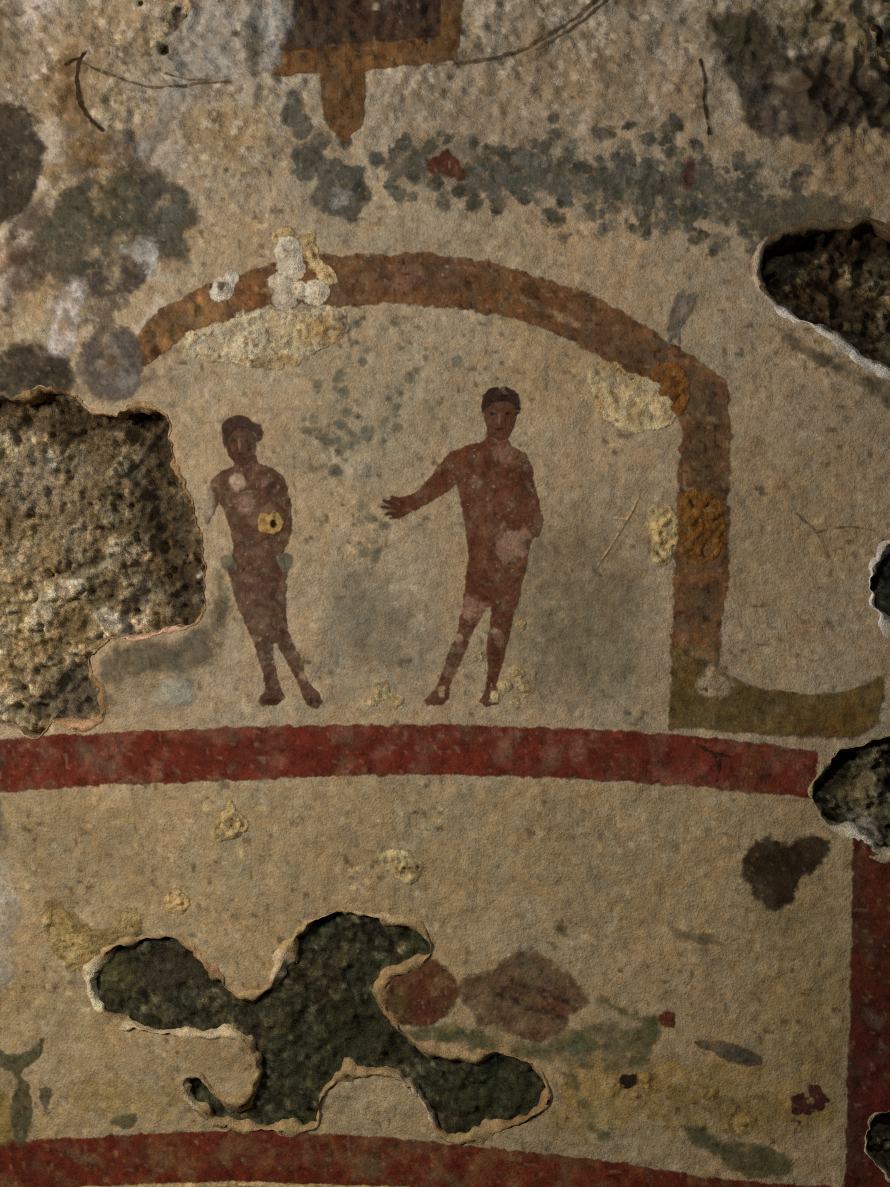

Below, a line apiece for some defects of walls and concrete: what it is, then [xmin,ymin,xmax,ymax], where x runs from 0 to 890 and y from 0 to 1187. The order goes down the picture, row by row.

water stain [136,0,229,157]
peeling [150,0,221,55]
water stain [707,13,890,144]
water stain [0,171,198,400]
spalling [748,217,890,382]
spalling [0,385,207,740]
spalling [869,540,890,640]
spalling [808,735,890,864]
peeling [164,888,190,914]
spalling [39,900,553,1146]
spalling [864,1111,890,1183]